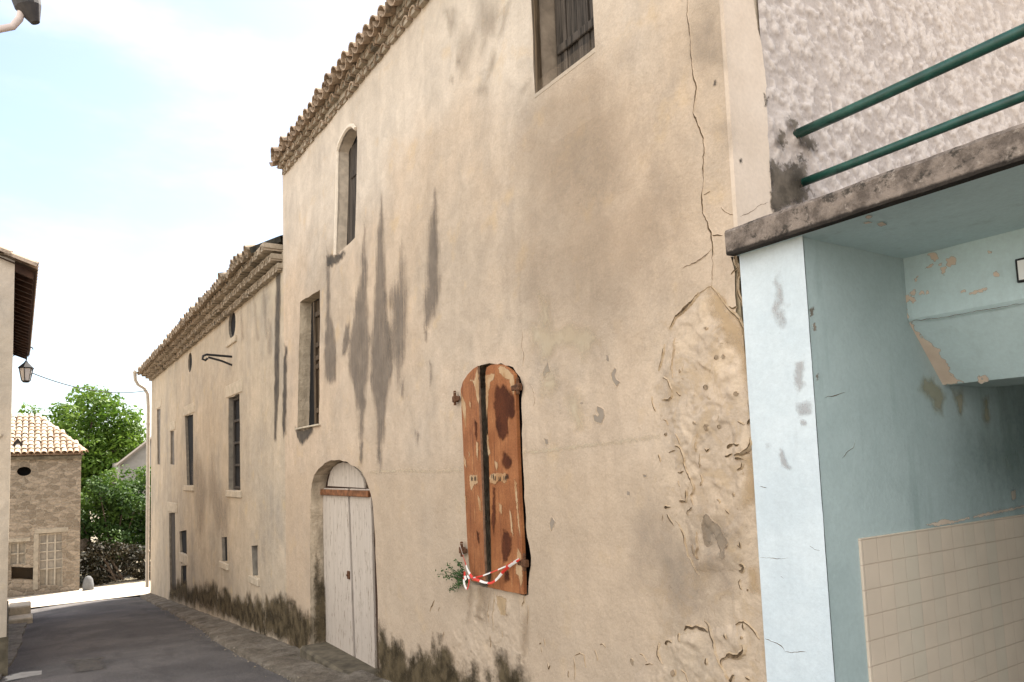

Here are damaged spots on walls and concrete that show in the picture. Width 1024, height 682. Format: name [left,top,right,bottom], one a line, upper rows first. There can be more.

water stain [325,209,405,466]
water stain [425,206,438,325]
crack [651,0,766,575]
peeling [906,253,963,385]